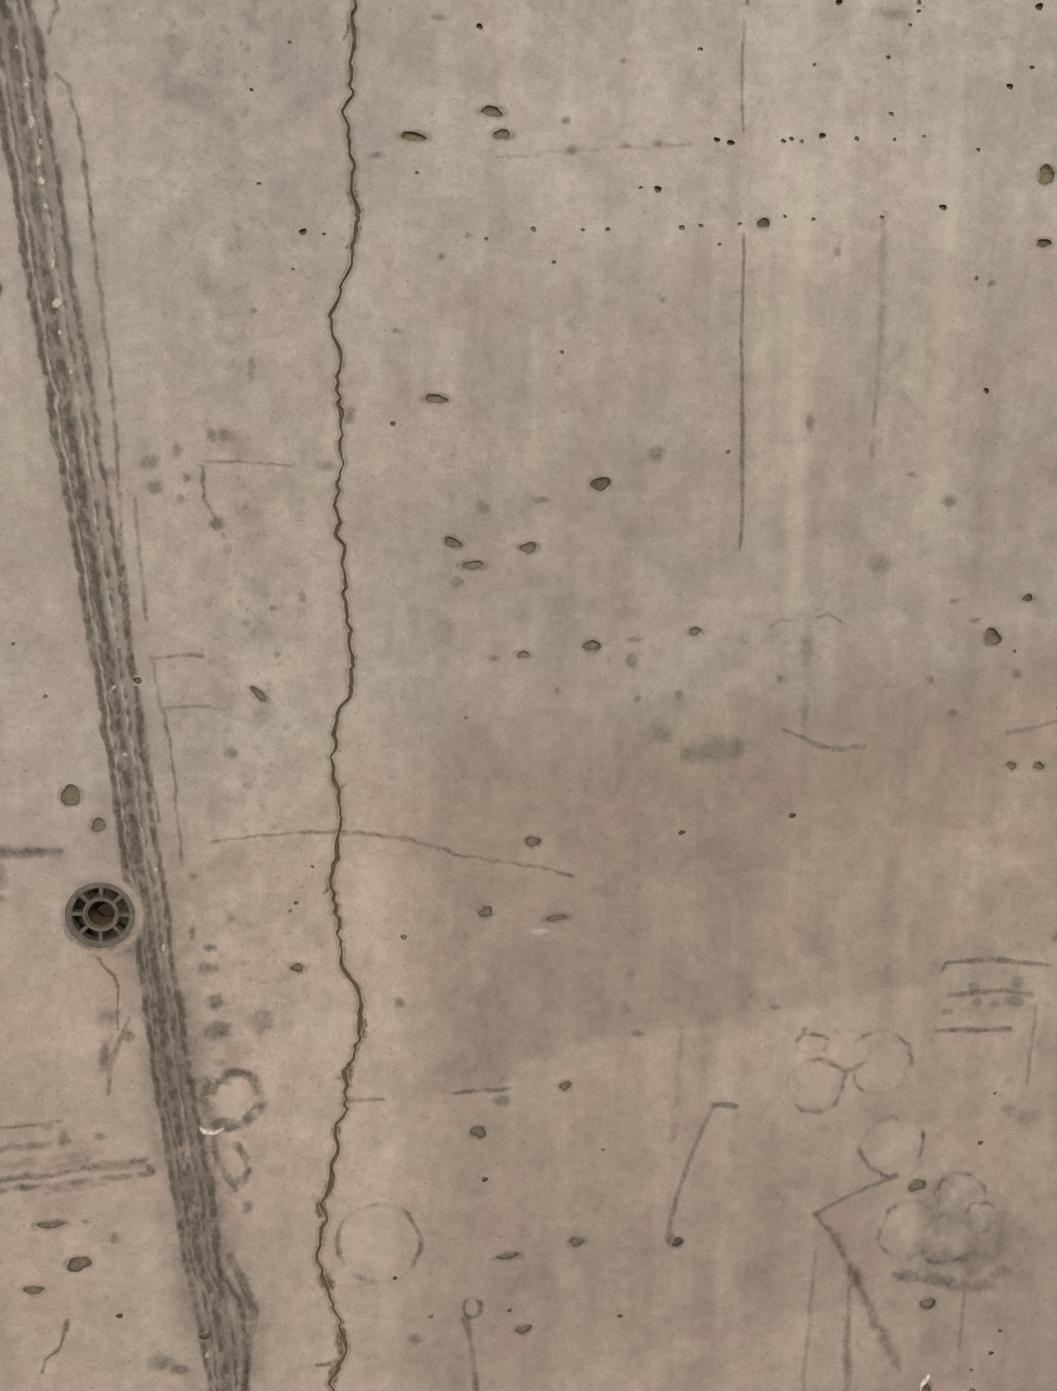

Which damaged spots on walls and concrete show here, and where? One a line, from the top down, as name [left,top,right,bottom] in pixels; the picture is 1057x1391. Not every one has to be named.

crack [309,0,367,1391]